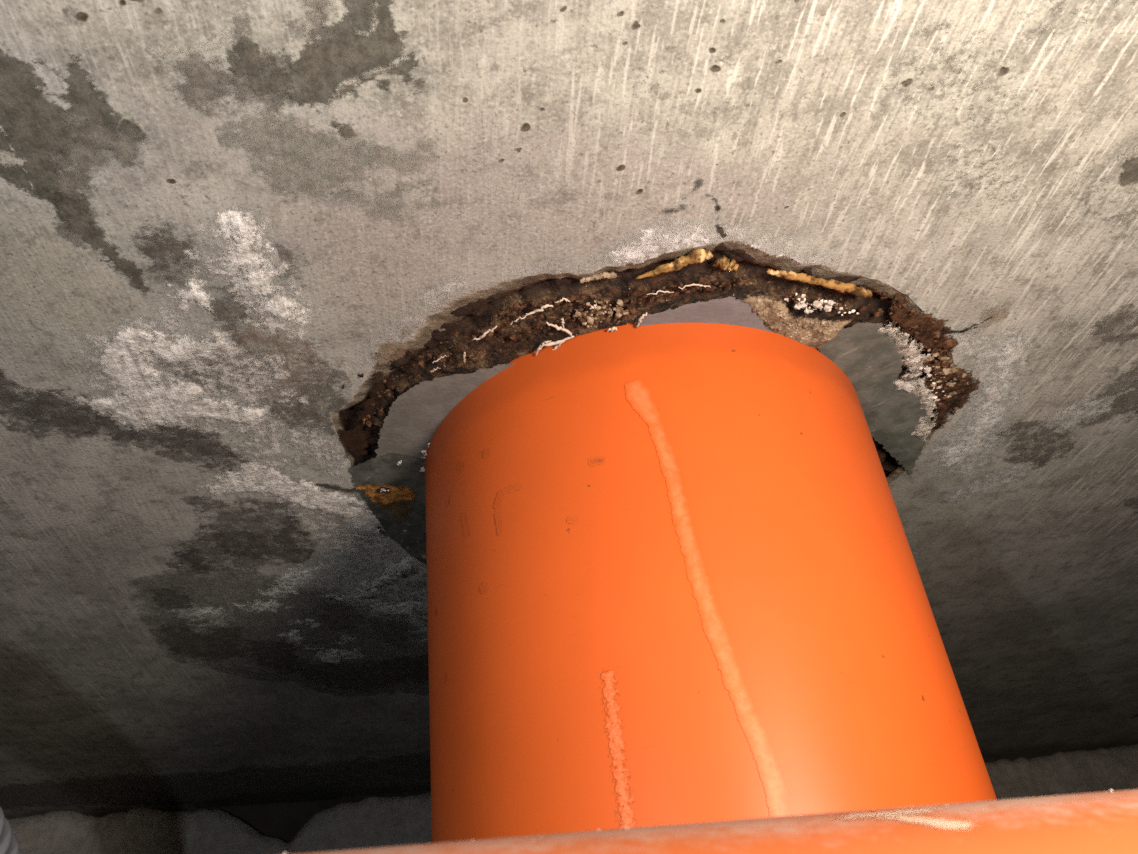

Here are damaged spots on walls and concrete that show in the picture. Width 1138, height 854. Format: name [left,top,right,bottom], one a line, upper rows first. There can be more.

leakage [508,218,840,279]
corrosion [880,291,981,432]
leakage [0,201,470,697]
corrosion [355,485,416,519]